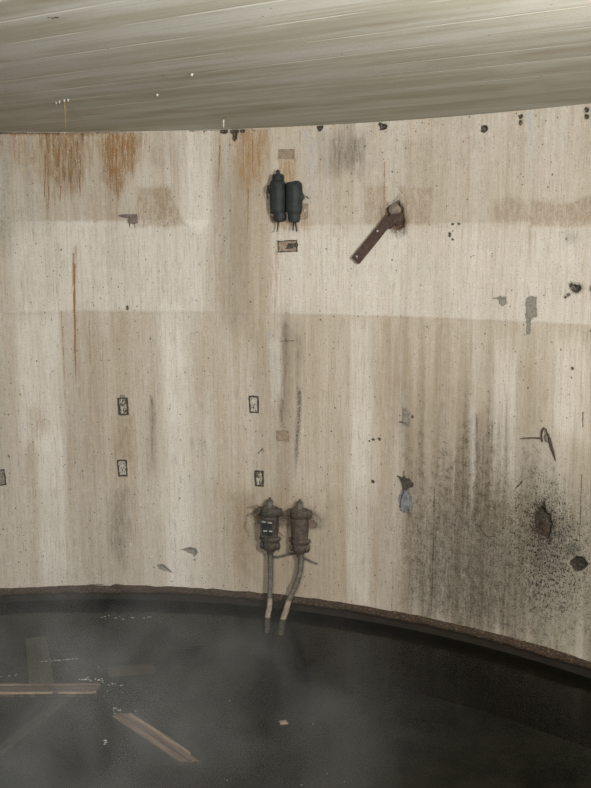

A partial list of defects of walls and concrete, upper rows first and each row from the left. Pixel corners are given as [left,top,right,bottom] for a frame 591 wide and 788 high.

corrosion [105,133,135,195]
mould [512,493,581,608]